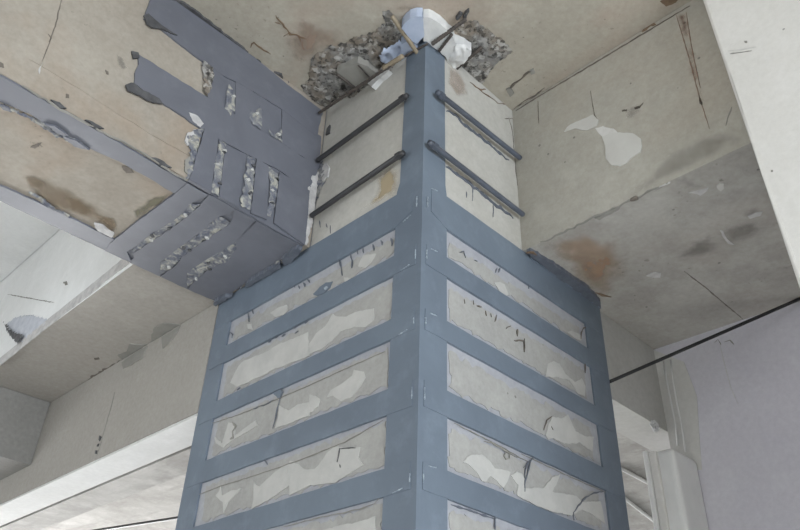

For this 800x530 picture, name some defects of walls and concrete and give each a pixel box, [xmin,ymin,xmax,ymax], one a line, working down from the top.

crack [38,0,62,74]
spalling [201,61,214,97]
spalling [301,7,513,114]
corrosion [676,13,710,129]
peeling [595,126,642,166]
damp [29,179,115,229]
spalling [4,315,47,344]